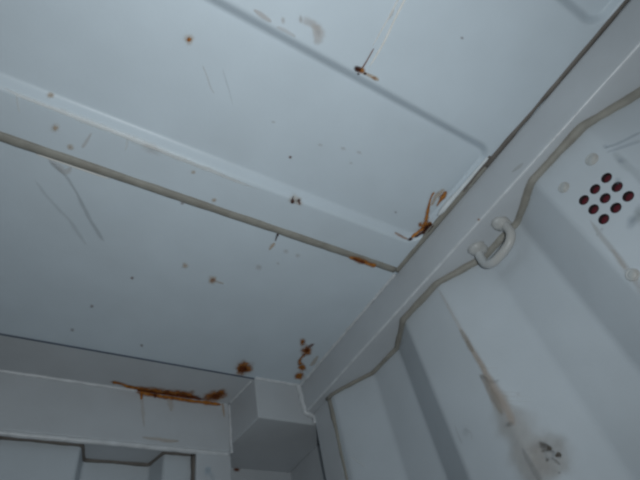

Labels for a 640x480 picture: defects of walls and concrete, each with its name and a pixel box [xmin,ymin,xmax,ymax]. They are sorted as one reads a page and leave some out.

corrosion [237,362,251,374]
corrosion [295,340,313,379]
corrosion [112,381,226,406]